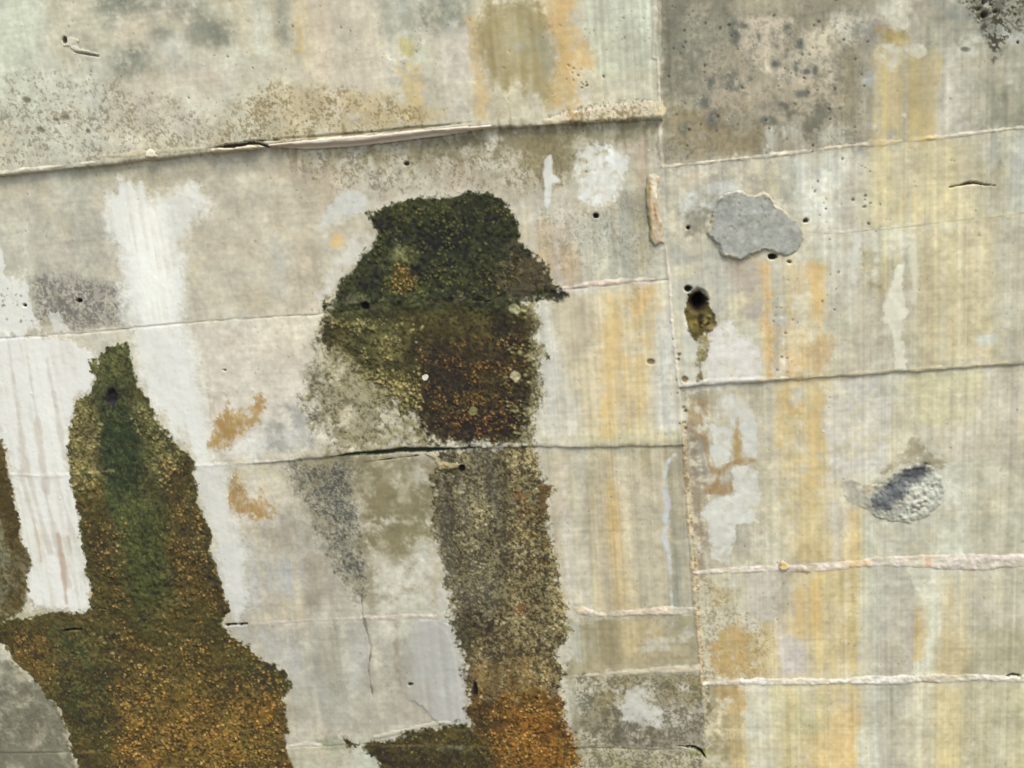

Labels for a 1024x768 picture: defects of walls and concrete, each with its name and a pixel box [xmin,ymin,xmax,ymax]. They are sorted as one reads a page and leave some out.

crack [216,123,462,149]
leakage [314,186,497,233]
spalling [706,190,806,259]
leakage [313,232,377,303]
leakage [0,249,98,620]
leakage [98,172,253,628]
corrosion [206,391,270,454]
crack [332,446,481,463]
corrosion [226,467,280,524]
spalling [841,462,945,524]
crack [360,597,374,697]
leakage [0,658,78,768]